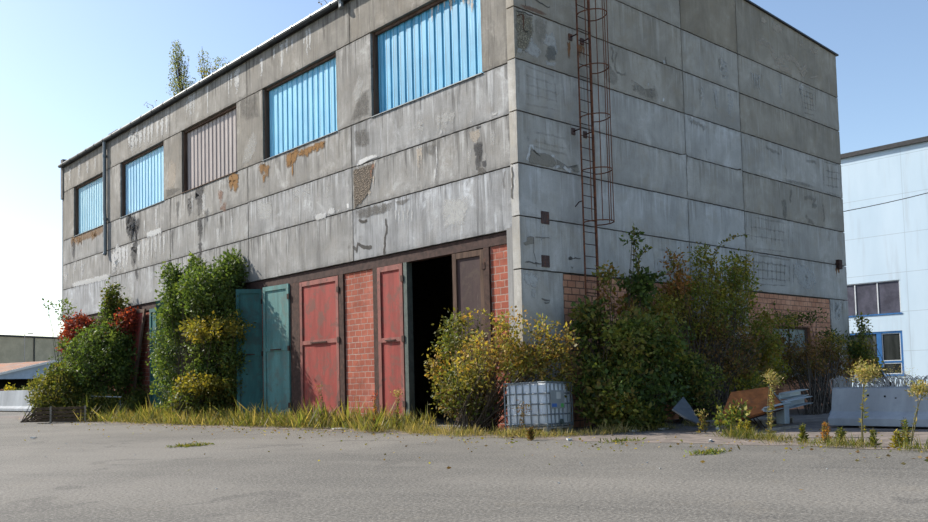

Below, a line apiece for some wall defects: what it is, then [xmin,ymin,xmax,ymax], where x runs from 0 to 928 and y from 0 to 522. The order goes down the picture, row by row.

spalling [516,10,533,51]
corrosion [286,141,325,175]
corrosion [218,173,238,211]
water stain [72,213,161,287]